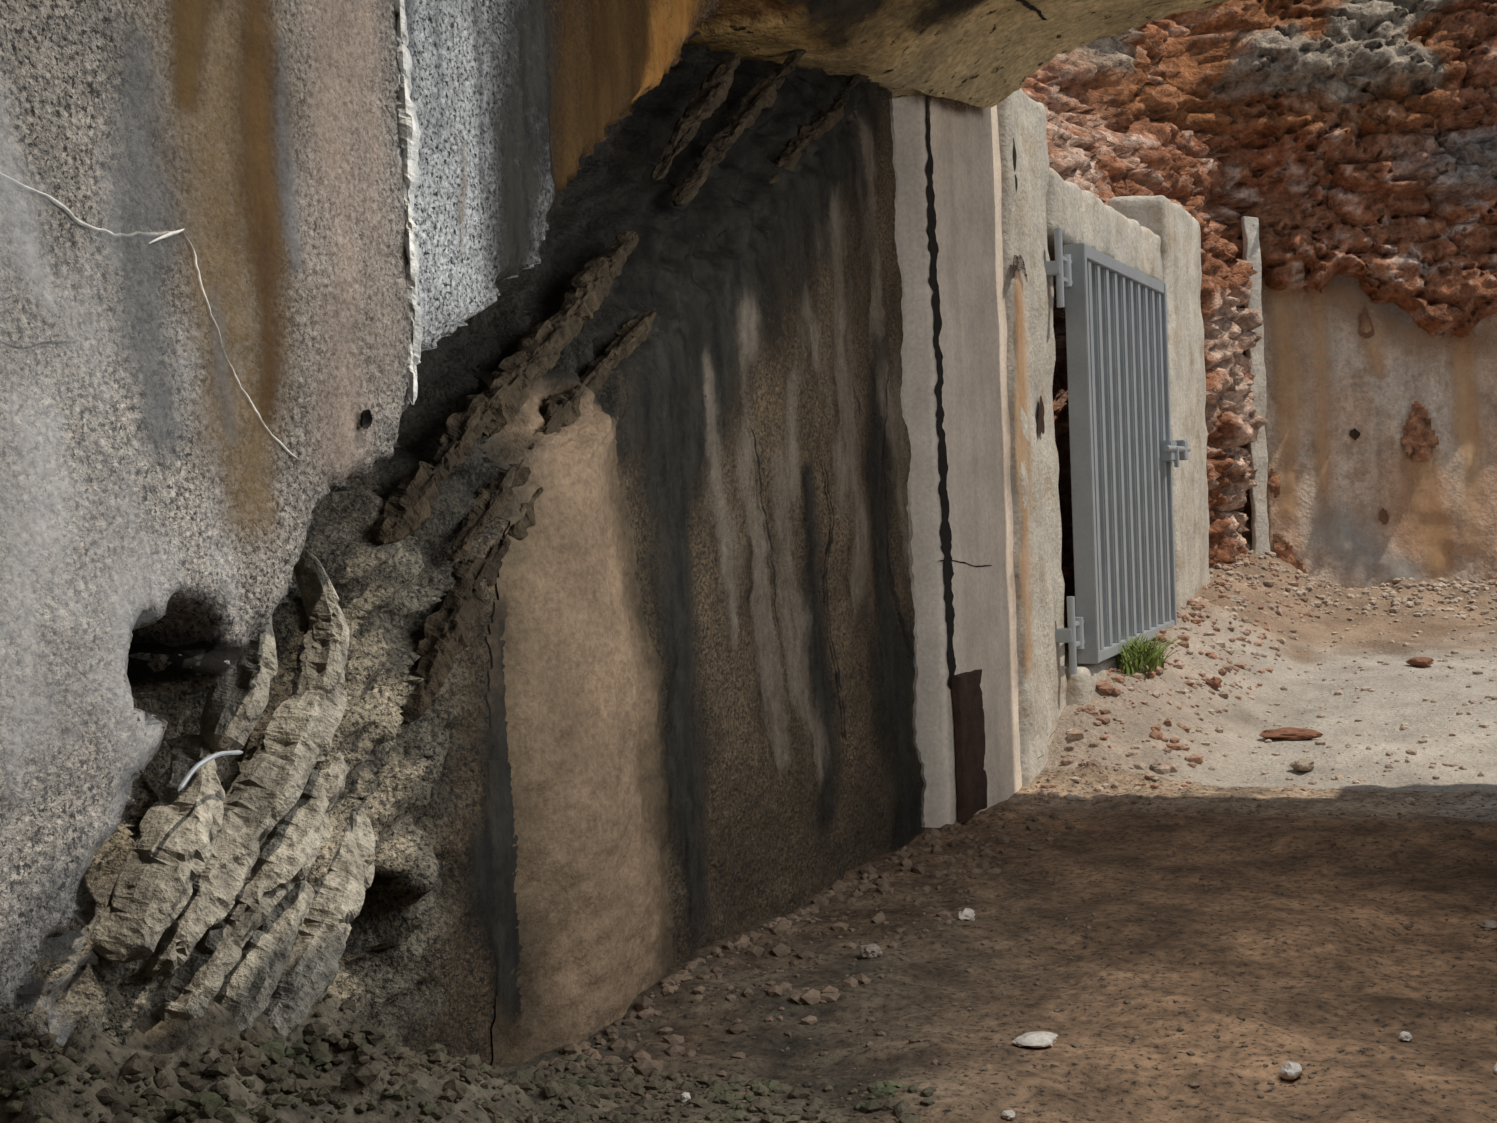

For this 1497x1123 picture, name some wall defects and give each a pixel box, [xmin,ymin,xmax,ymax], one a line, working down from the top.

crack [0,172,300,461]
corrosion [172,0,283,521]
spalling [393,0,424,405]
spalling [370,231,656,725]
spalling [650,49,806,207]
spalling [768,74,869,184]
spalling [89,550,375,1038]